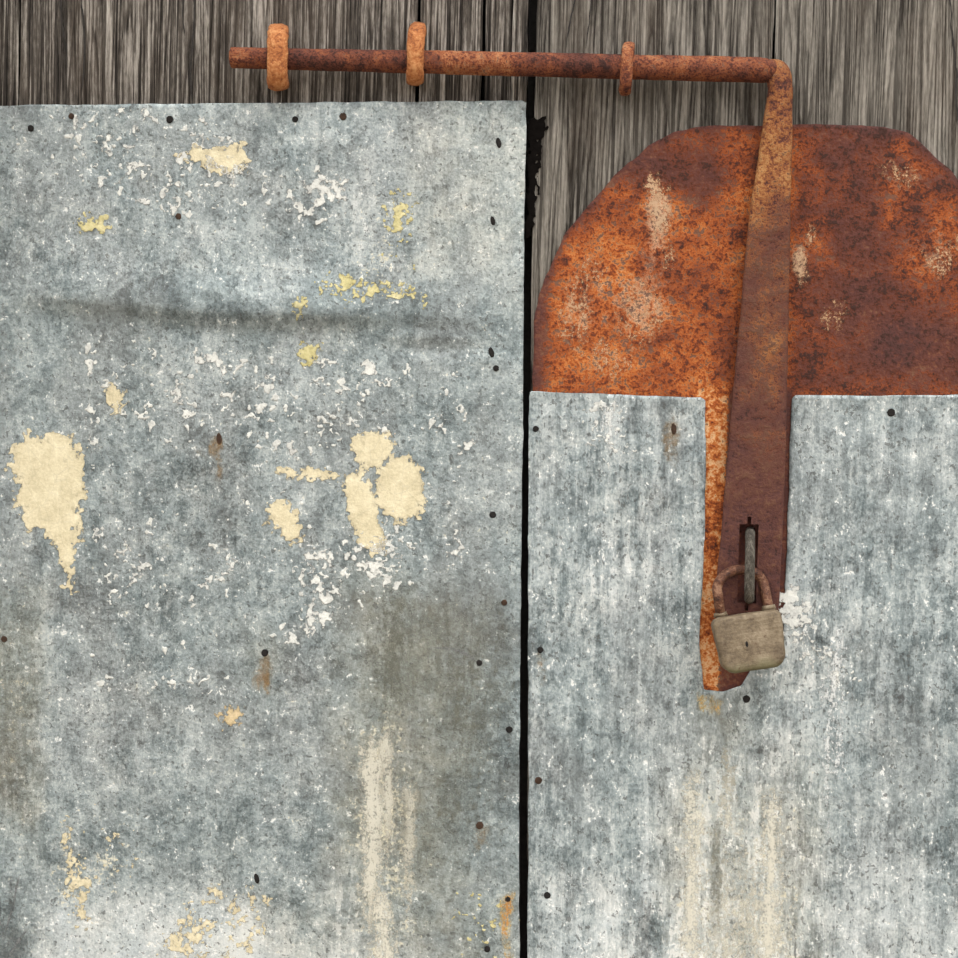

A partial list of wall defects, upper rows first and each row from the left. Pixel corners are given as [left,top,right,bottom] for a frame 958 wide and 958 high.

peeling [73,211,112,234]
peeling [38,106,252,222]
peeling [261,164,349,230]
peeling [381,188,418,257]
peeling [314,264,428,309]
peeling [79,343,162,441]
peeling [421,404,467,434]
peeling [4,428,179,605]
peeling [150,341,430,644]
peeling [149,664,229,695]
peeling [58,815,140,931]
peeling [156,883,273,958]